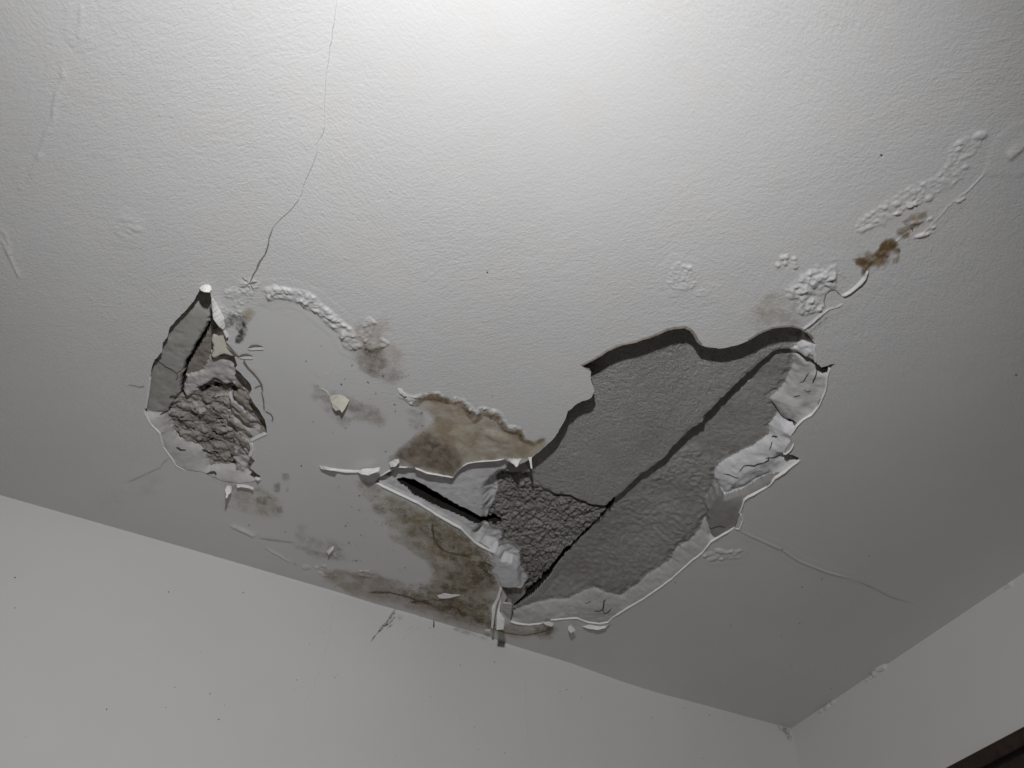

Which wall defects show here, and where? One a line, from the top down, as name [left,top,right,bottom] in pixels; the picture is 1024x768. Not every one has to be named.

crack [241,2,337,290]
corrosion [855,216,922,274]
flaking render [143,269,396,498]
water stain [327,499,552,639]
water stain [397,394,544,475]
flaking render [320,325,835,633]